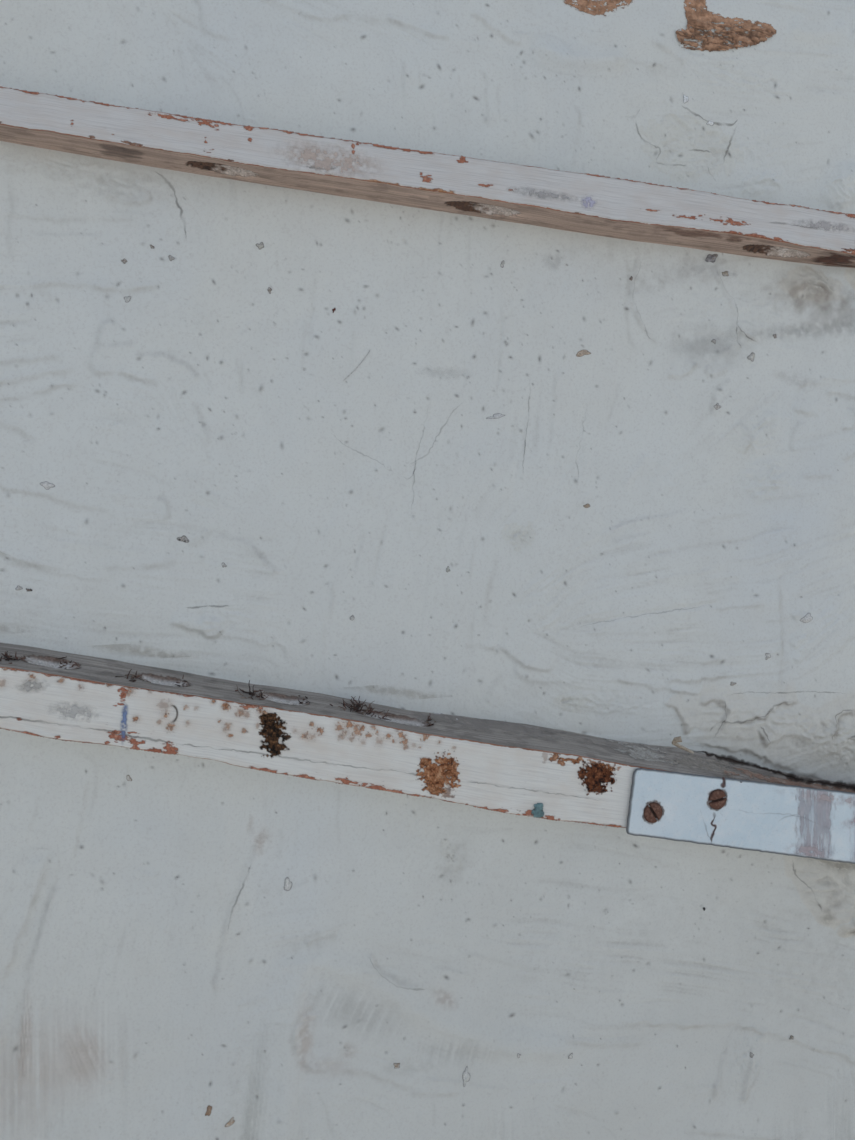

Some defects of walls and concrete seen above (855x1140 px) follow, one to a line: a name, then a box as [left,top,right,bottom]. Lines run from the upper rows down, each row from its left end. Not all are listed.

corrosion [212,700,461,798]
corrosion [549,753,621,795]